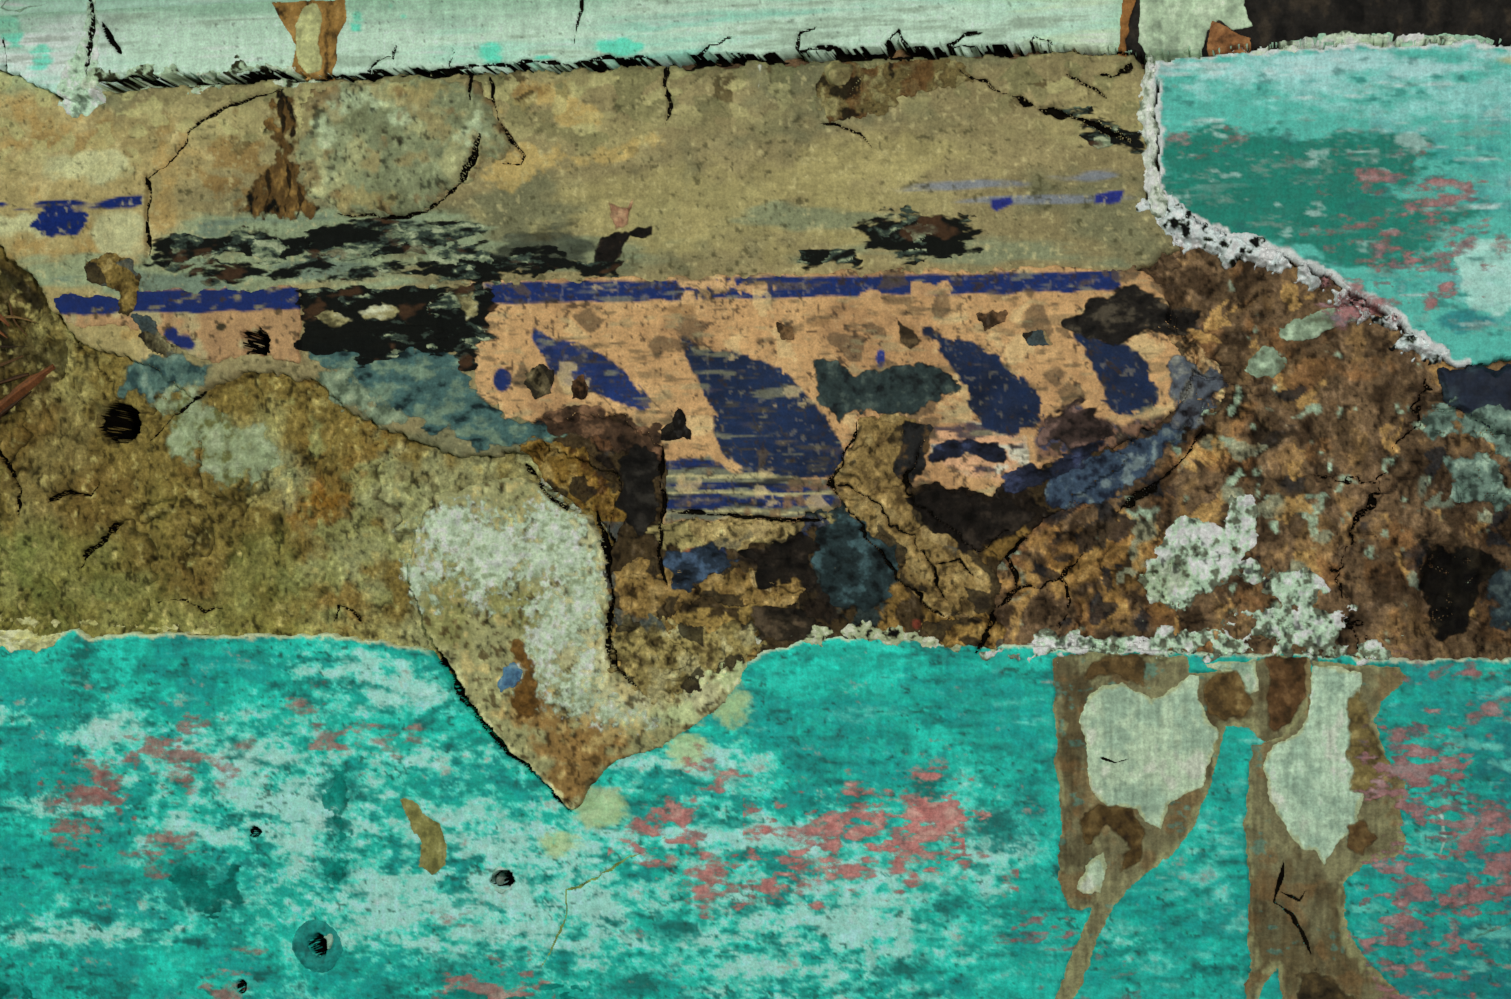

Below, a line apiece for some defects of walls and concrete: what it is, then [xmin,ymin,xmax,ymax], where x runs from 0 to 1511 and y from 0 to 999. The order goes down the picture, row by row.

spalling [57,0,347,118]
crack [85,0,1133,256]
peeling [501,201,652,281]
peeling [797,205,984,270]
peeling [316,305,399,327]
peeling [814,358,961,423]
crack [657,413,1083,653]
peeling [928,439,1006,463]
crack [1117,430,1203,513]
crack [1315,378,1433,650]
peeling [608,758,991,918]
peeling [1359,779,1511,908]